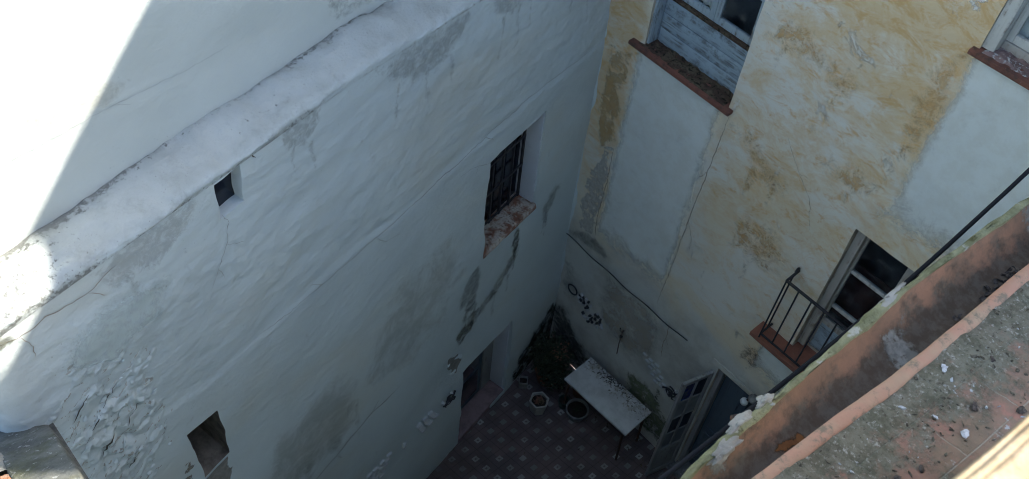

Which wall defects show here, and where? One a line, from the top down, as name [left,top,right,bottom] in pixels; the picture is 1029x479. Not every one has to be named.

crack [657,118,729,302]
crack [14,266,115,355]
peeling [46,344,173,479]
flaking render [208,456,232,479]